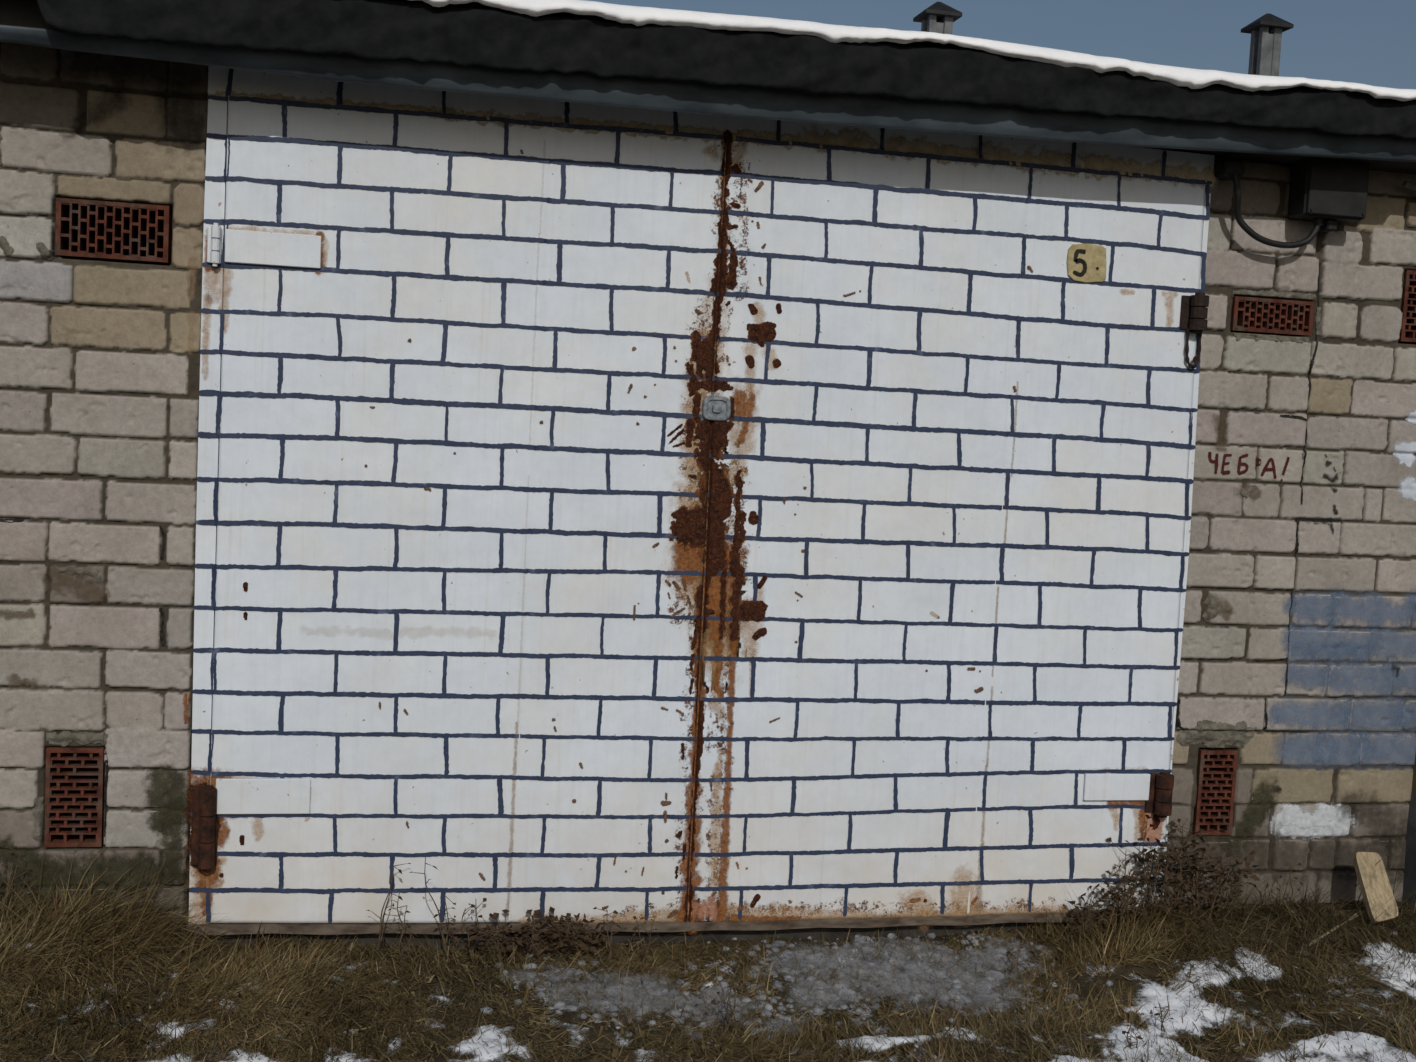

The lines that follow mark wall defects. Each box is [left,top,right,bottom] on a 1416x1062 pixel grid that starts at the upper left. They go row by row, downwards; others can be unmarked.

corrosion [521,129,1066,934]
corrosion [184,769,261,924]
corrosion [1107,800,1164,842]